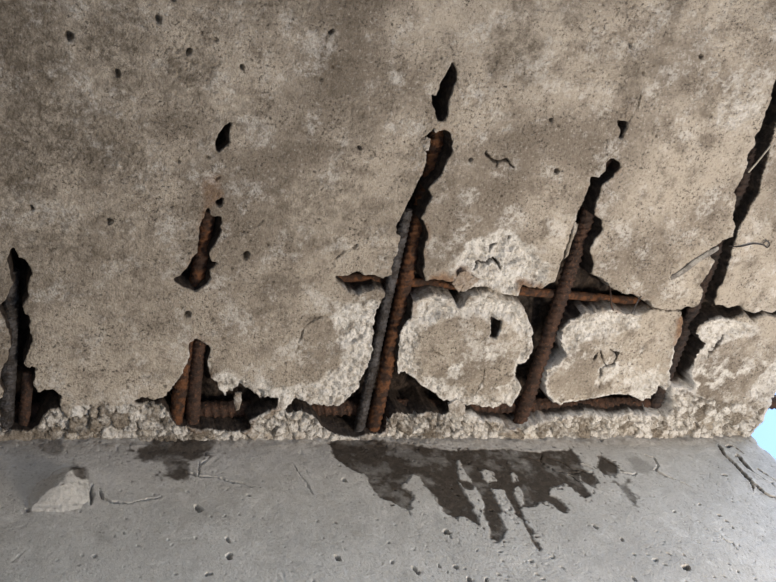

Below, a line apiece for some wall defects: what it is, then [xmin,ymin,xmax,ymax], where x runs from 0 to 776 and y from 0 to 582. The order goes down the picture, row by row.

spalling [0,61,776,448]
rust [427,270,454,282]
crack [707,334,726,359]
damp [124,438,228,489]
damp [321,437,655,556]
crack [717,443,776,499]